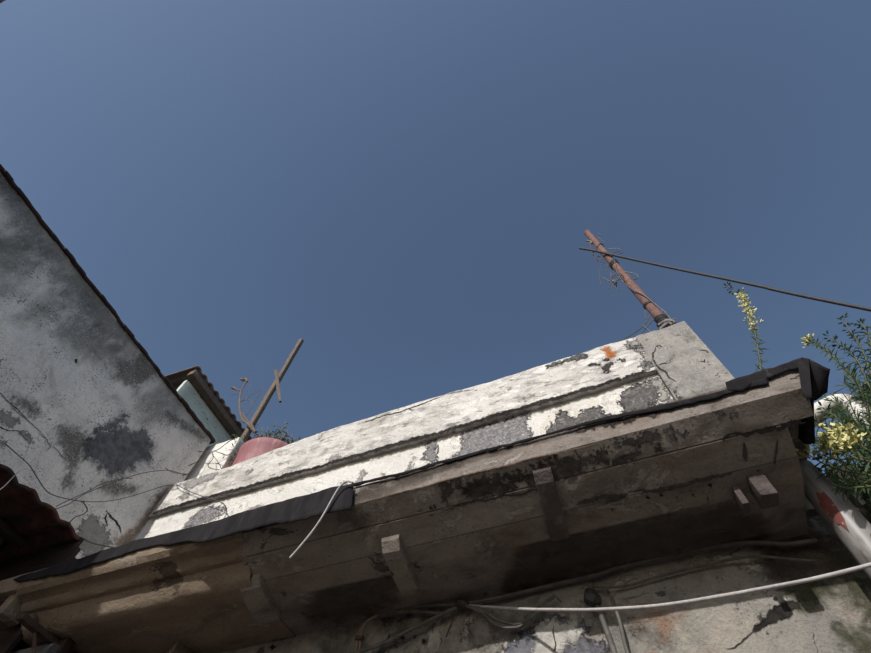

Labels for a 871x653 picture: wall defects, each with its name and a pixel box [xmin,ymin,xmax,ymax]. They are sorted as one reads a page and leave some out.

crack [0,393,67,460]
leakage [58,414,154,495]
peeling [404,411,535,472]
peeling [429,420,693,510]
peeling [546,380,661,433]
peeling [711,408,739,421]
peeling [77,513,114,558]
peeling [182,503,226,529]
flaking render [497,612,610,653]